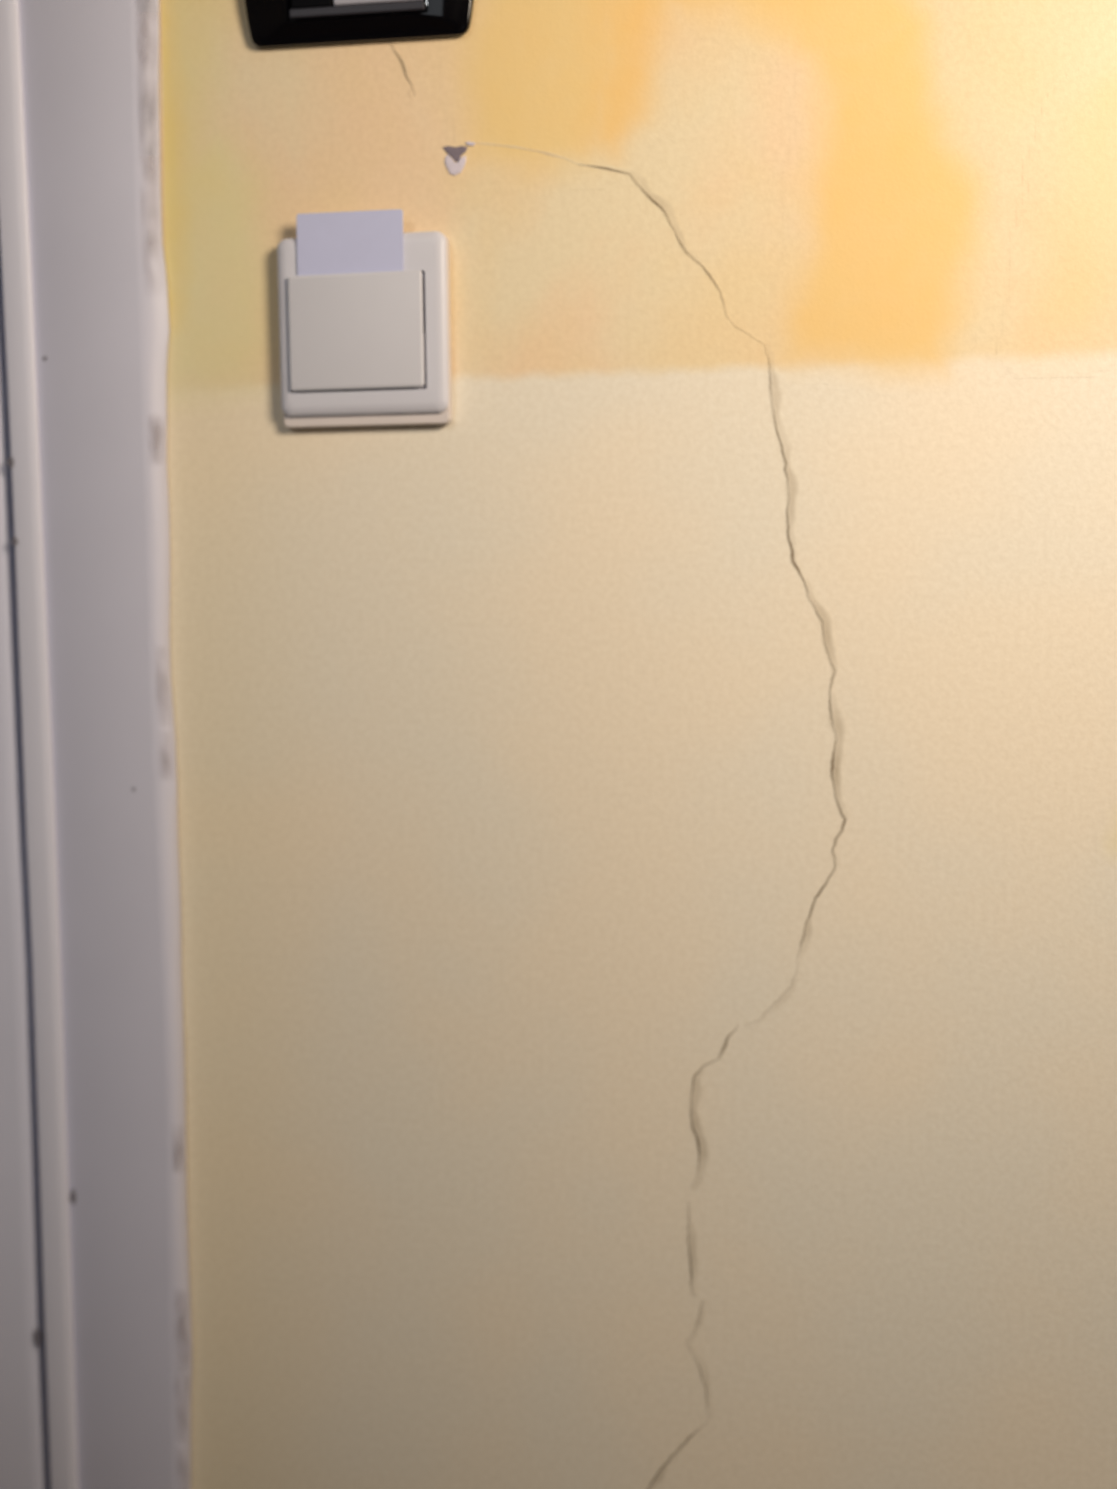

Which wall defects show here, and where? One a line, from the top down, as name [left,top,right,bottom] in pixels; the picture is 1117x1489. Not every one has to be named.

leakage [162,0,303,432]
crack [389,41,417,99]
leakage [441,0,1117,395]
crack [475,142,851,1489]